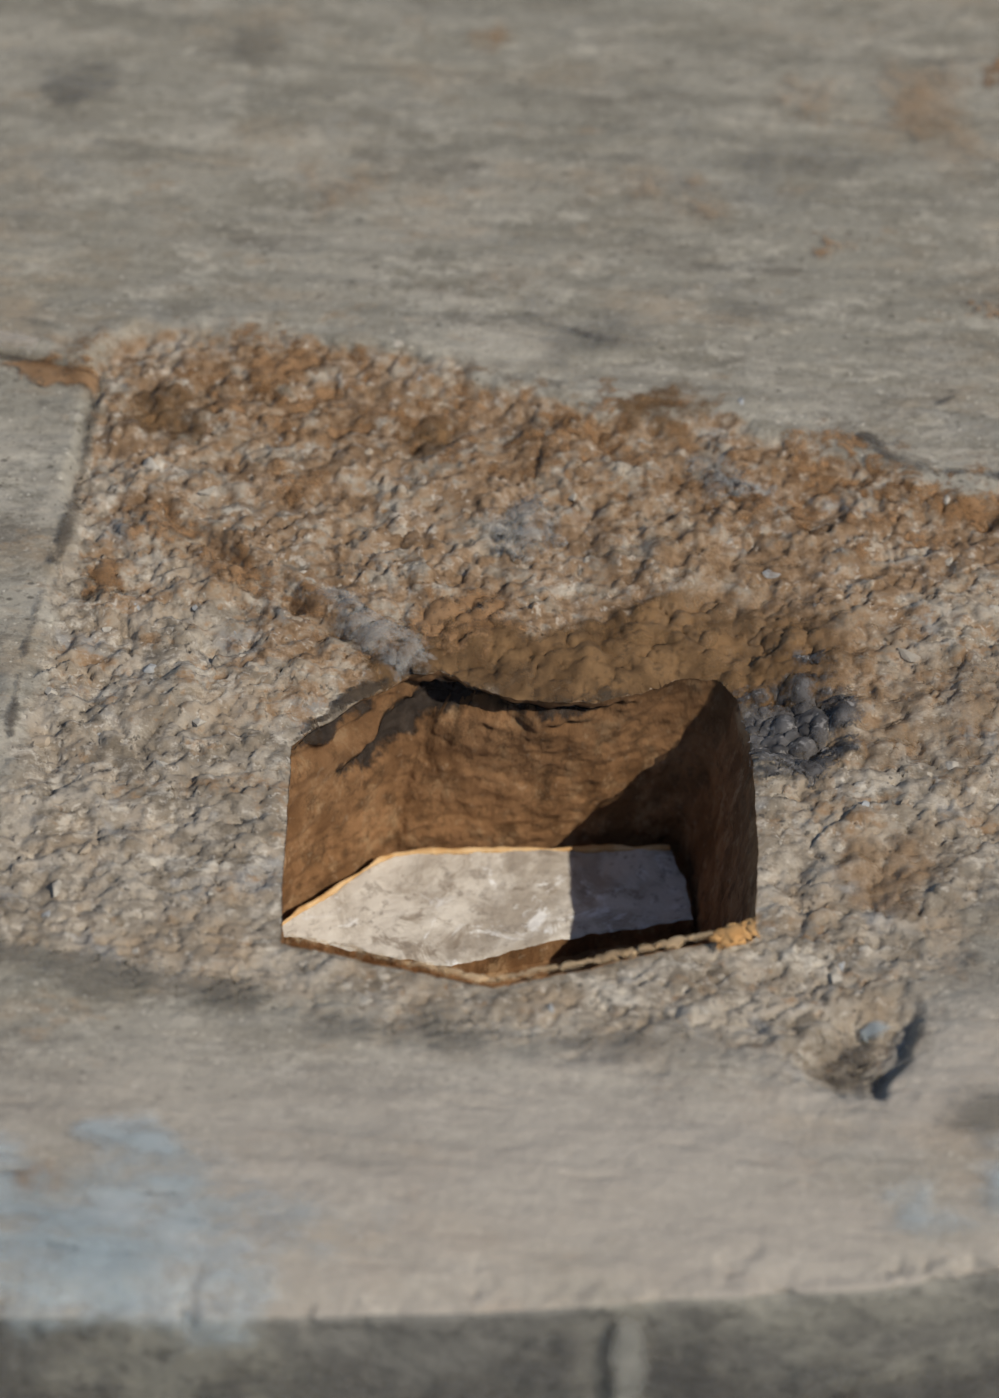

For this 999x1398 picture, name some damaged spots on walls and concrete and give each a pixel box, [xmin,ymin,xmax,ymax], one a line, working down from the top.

rust [4,353,101,395]
spalling [0,323,999,1095]